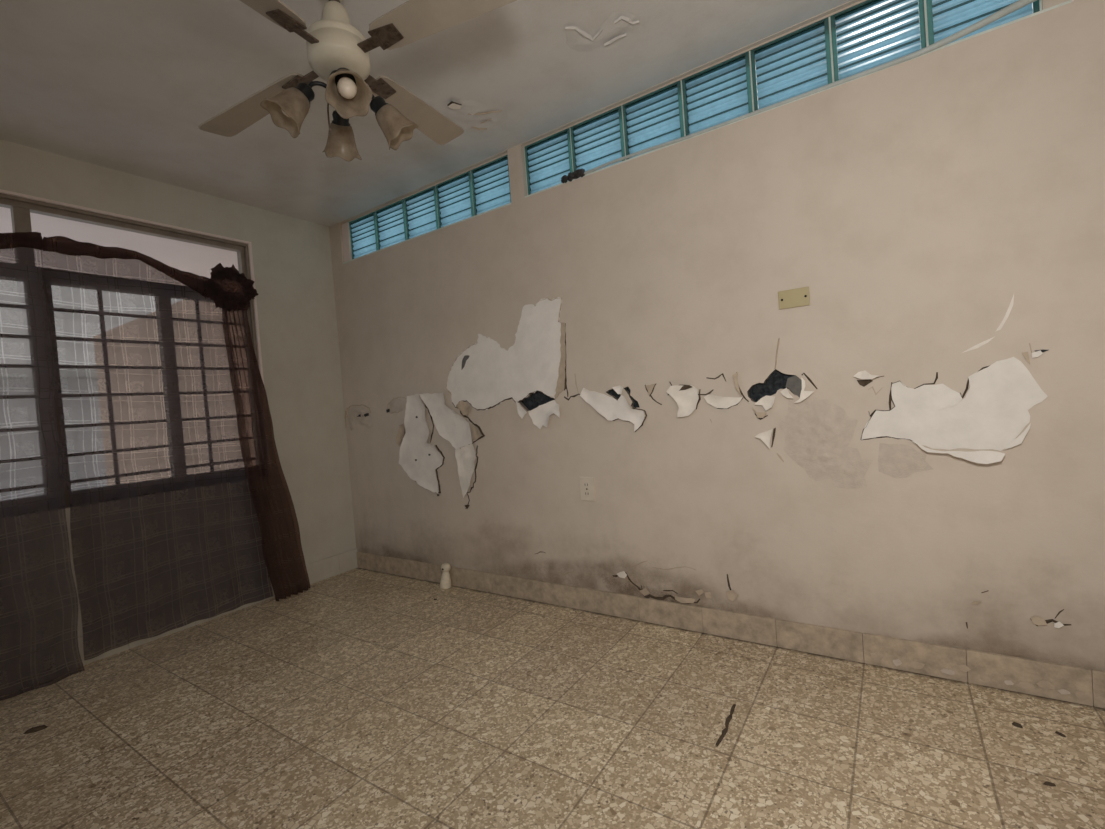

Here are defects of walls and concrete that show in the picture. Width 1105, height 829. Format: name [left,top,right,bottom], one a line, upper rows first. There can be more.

peeling [396,297,567,509]
peeling [580,385,647,432]
spalling [666,338,818,462]
peeling [853,343,1048,464]